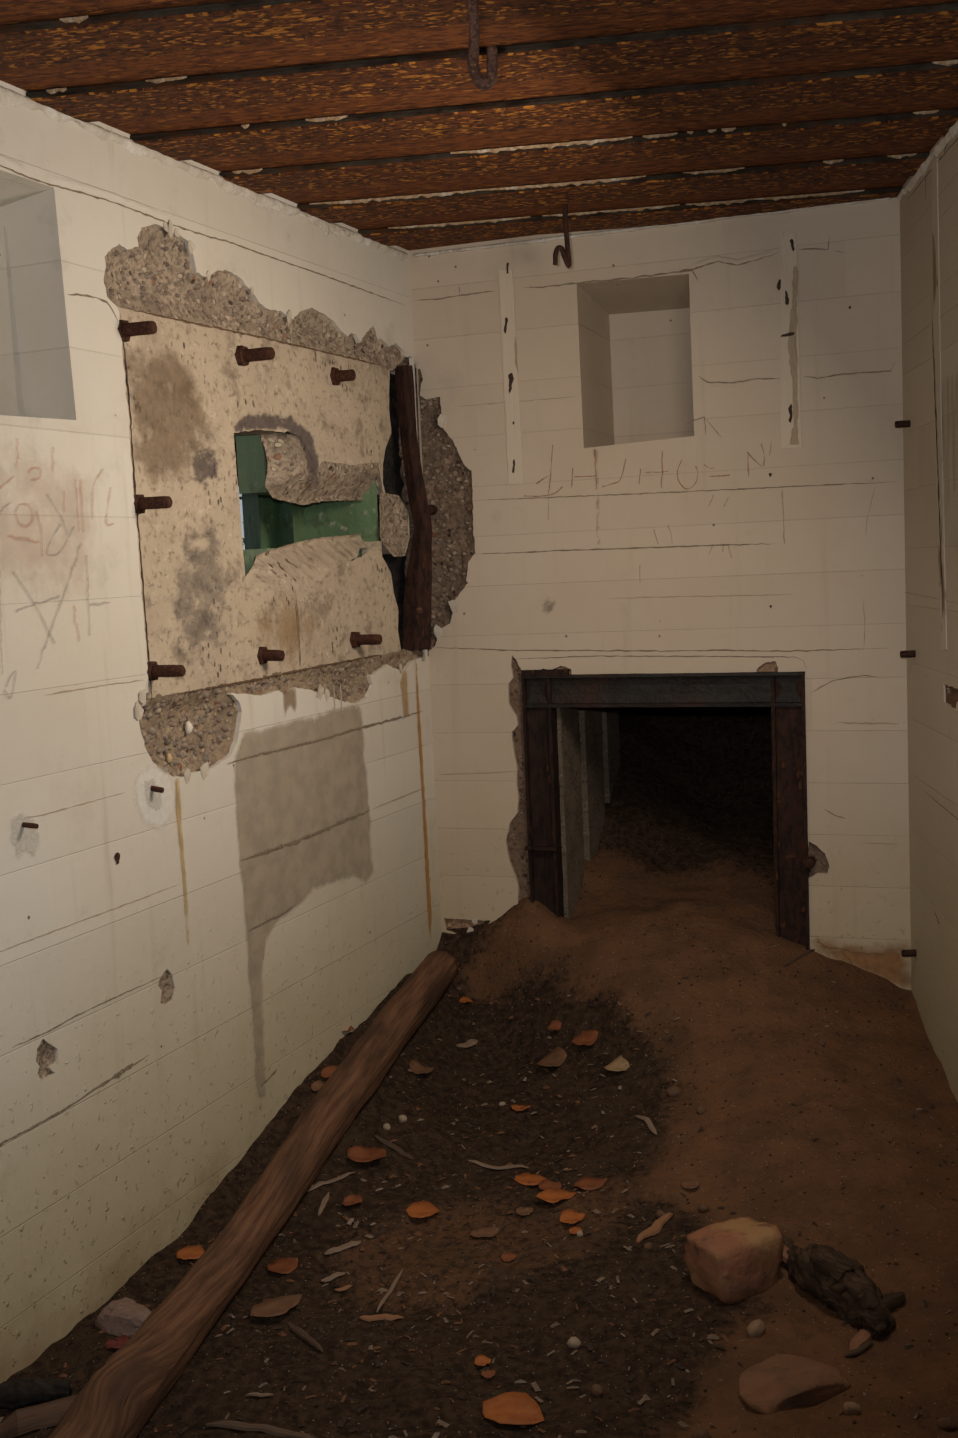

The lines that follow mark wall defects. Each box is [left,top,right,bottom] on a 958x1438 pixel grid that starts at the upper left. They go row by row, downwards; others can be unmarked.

peeling [242,192,311,220]
peeling [103,220,475,1095]
corrosion [176,780,187,913]
corrosion [401,664,432,934]
spalling [507,657,530,900]
spalling [445,917,485,932]
peeling [36,1039,56,1079]